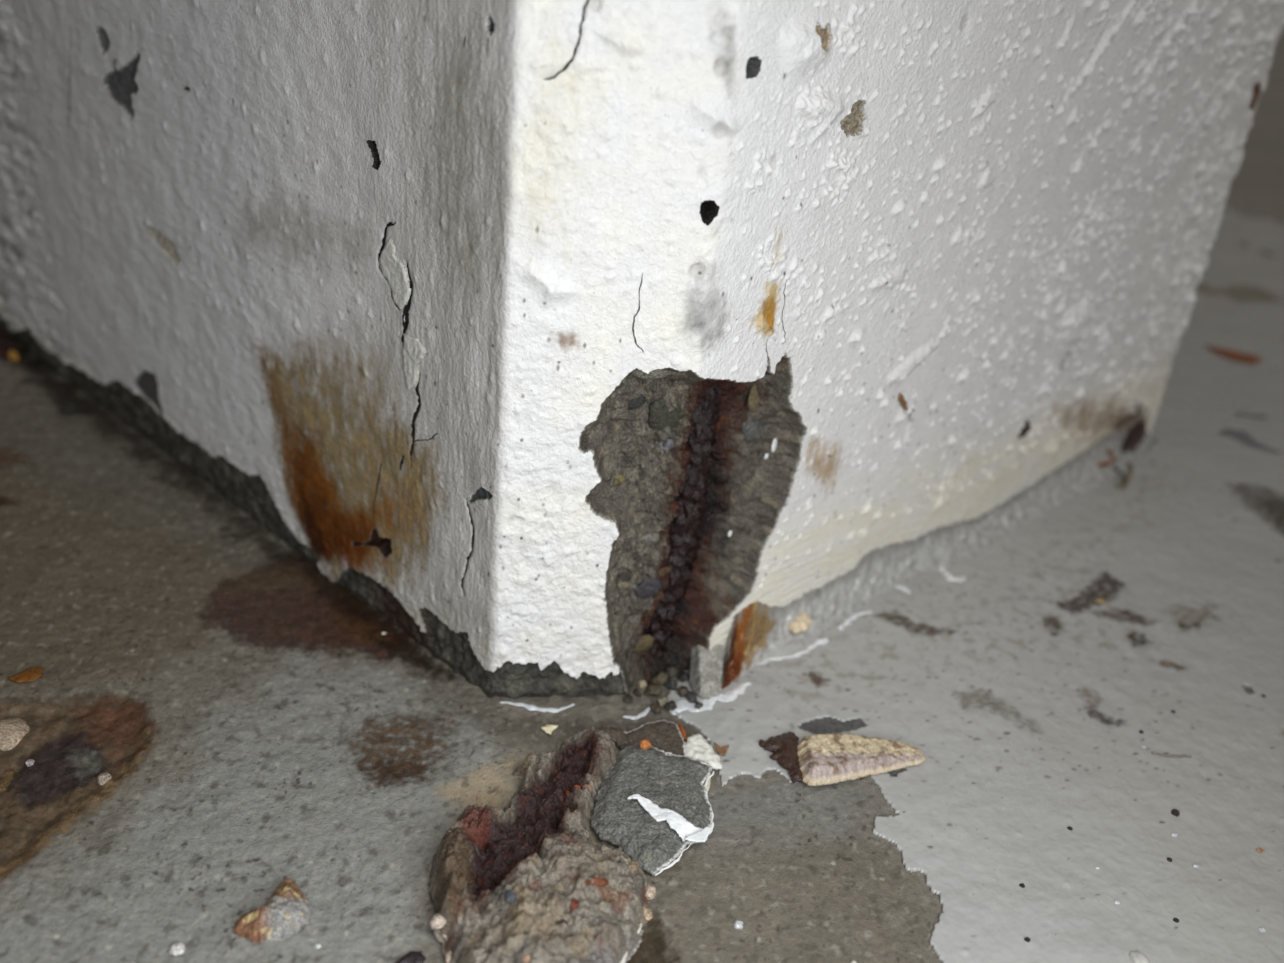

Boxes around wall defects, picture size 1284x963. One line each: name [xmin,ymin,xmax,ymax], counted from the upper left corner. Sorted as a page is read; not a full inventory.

peeling [96,26,140,121]
crack [543,0,589,80]
peeling [840,99,866,138]
rust [756,285,777,334]
crack [373,222,437,509]
peeling [0,316,318,565]
rust [200,349,454,680]
crack [461,502,474,595]
spalling [335,352,808,699]
rust [721,601,774,689]